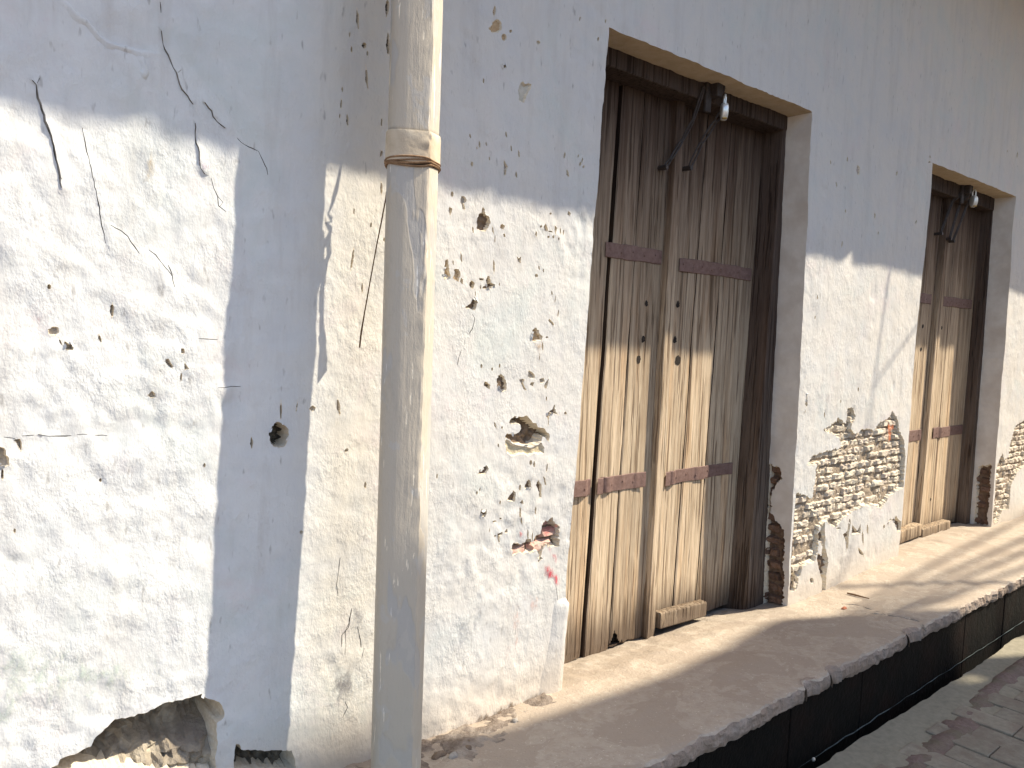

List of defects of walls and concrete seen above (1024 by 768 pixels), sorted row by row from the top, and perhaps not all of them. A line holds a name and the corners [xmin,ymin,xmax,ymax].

crack [32,78,62,188]
crack [82,128,175,287]
crack [160,2,268,211]
flaking render [480,371,567,562]
flaking render [763,400,906,605]
flaking render [973,420,1024,526]
flaking render [52,694,225,768]
spalling [234,744,296,768]